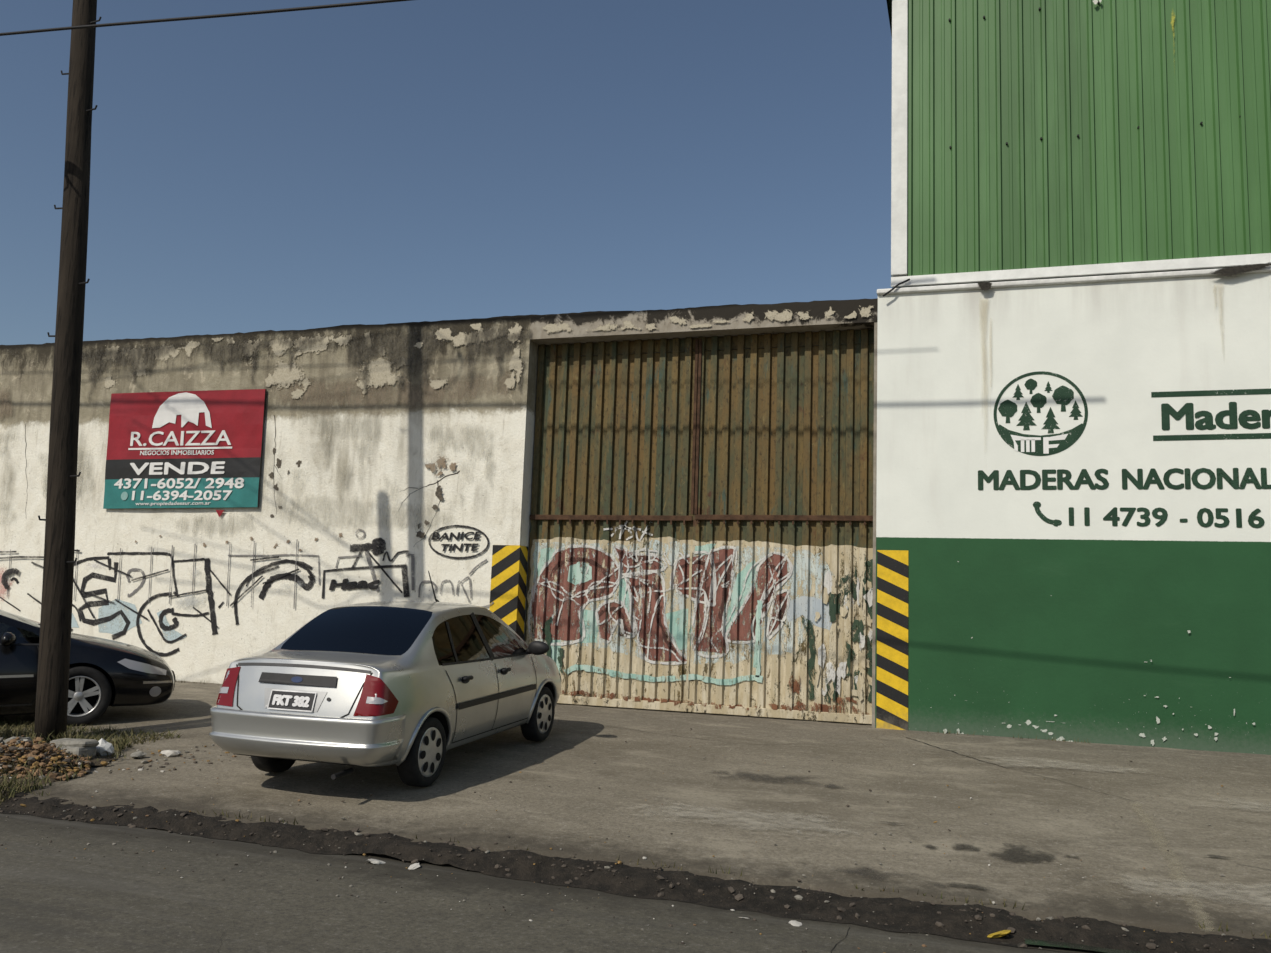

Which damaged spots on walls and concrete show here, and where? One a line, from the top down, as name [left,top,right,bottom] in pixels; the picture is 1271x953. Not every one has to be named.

peeling [543,320,657,334]
peeling [669,305,873,328]
water stain [82,346,174,385]
water stain [203,336,323,373]
peeling [101,322,523,400]
water stain [278,326,531,407]
peeling [801,559,873,703]
corrosion [562,678,869,715]
peeling [1007,715,1073,742]